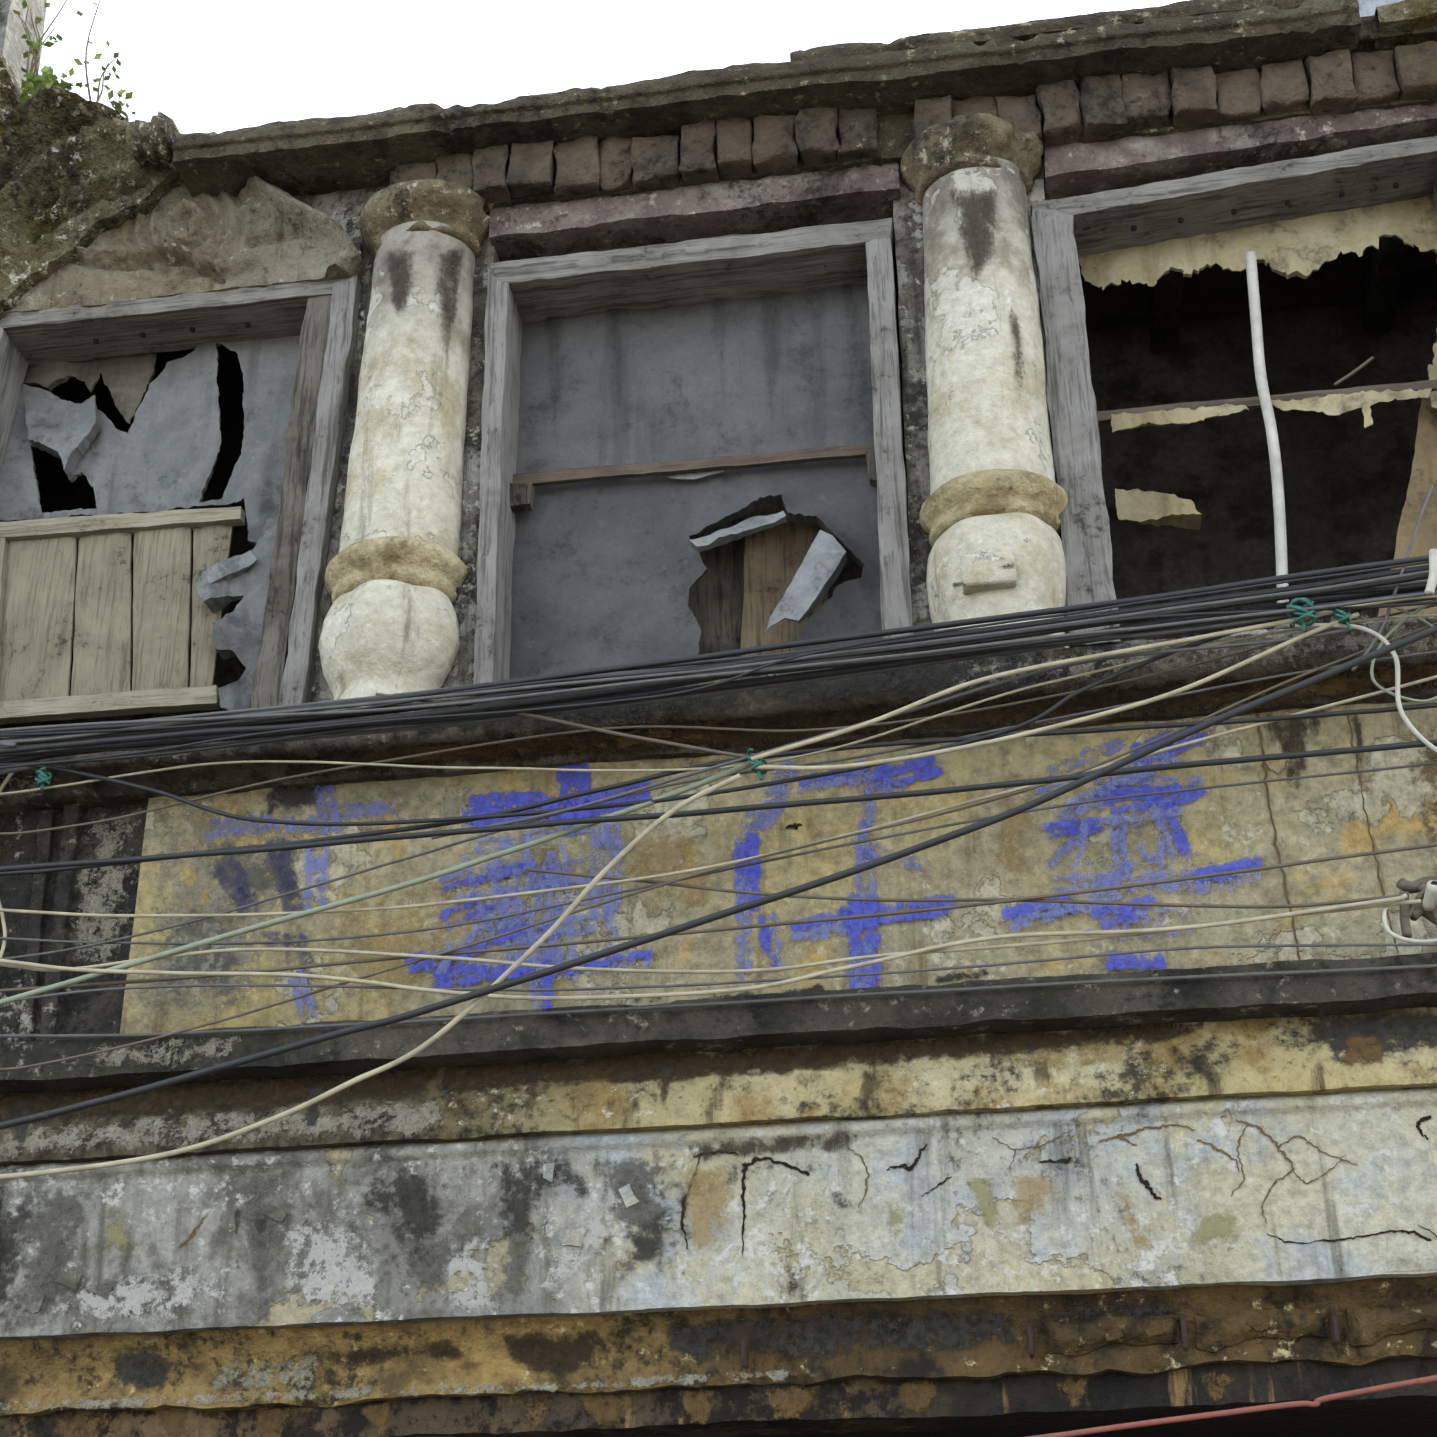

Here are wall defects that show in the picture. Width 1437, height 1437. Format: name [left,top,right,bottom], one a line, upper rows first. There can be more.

leakage [387,251,411,310]
leakage [437,249,462,330]
leakage [950,190,996,276]
leakage [0,1185,91,1325]
leakage [363,1175,472,1289]
crack [680,1149,810,1255]
crack [992,1116,1437,1244]